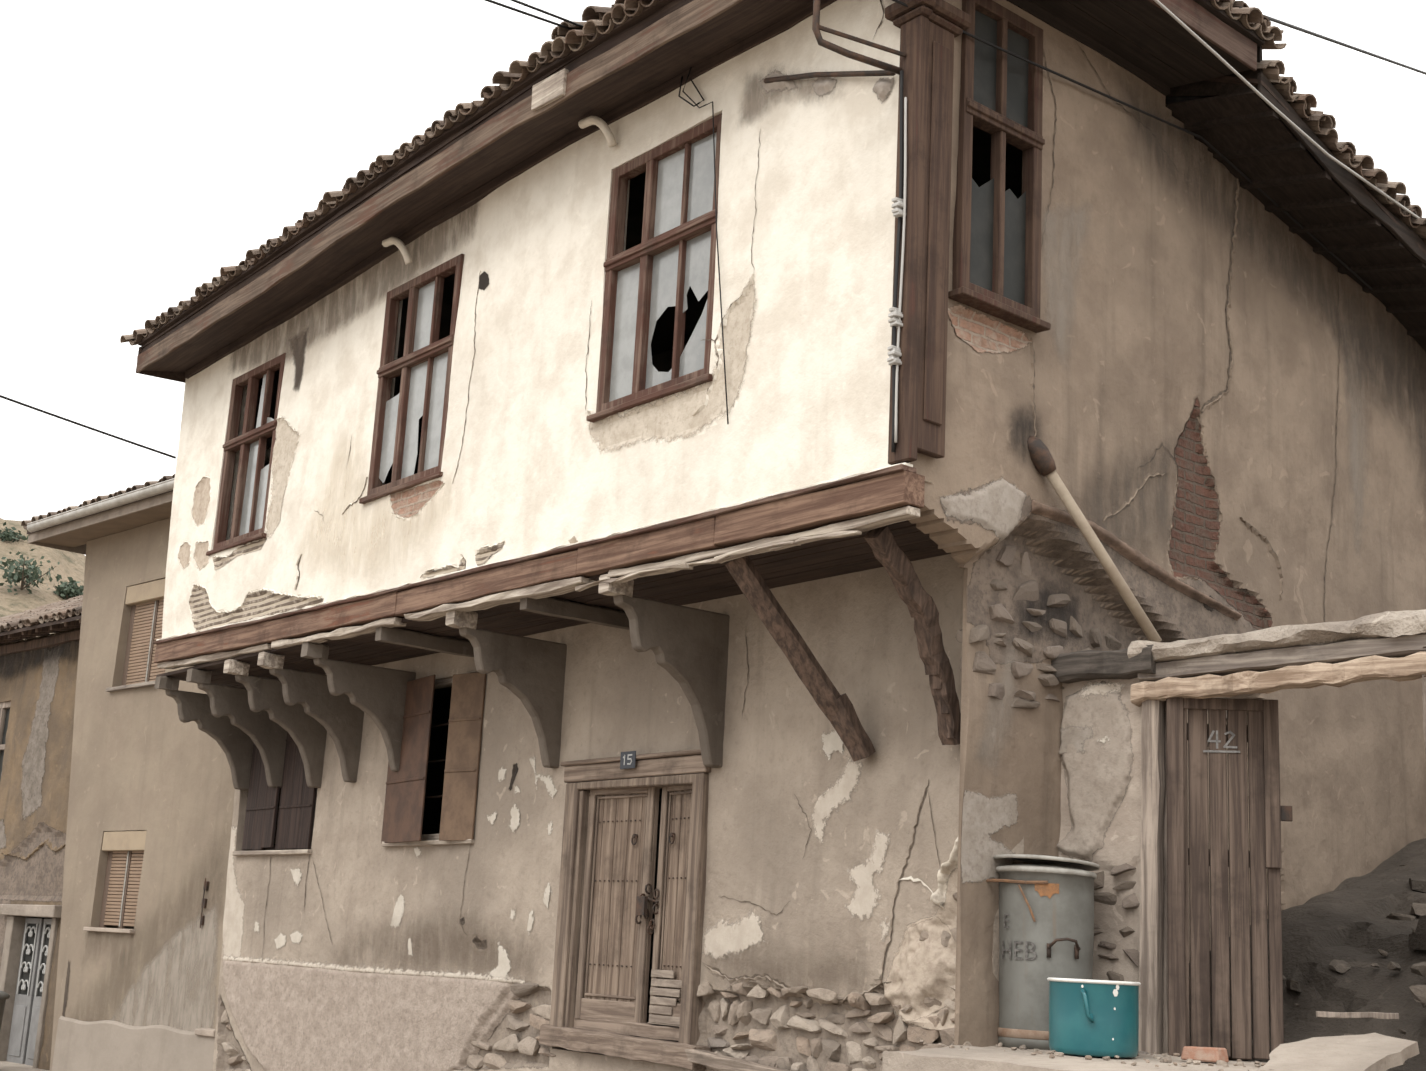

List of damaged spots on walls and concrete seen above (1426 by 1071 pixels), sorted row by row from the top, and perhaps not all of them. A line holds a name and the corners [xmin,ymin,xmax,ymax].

crack [452,271,481,484]
flaking render [587,282,756,451]
crack [692,134,760,416]
crack [1201,177,1239,412]
flaking render [178,416,323,632]
flaking render [389,480,445,521]
flaking render [940,397,1273,709]
flaking render [0,646,66,968]
crack [702,780,941,1006]
peeling [812,730,863,843]
spalling [696,790,1018,1071]